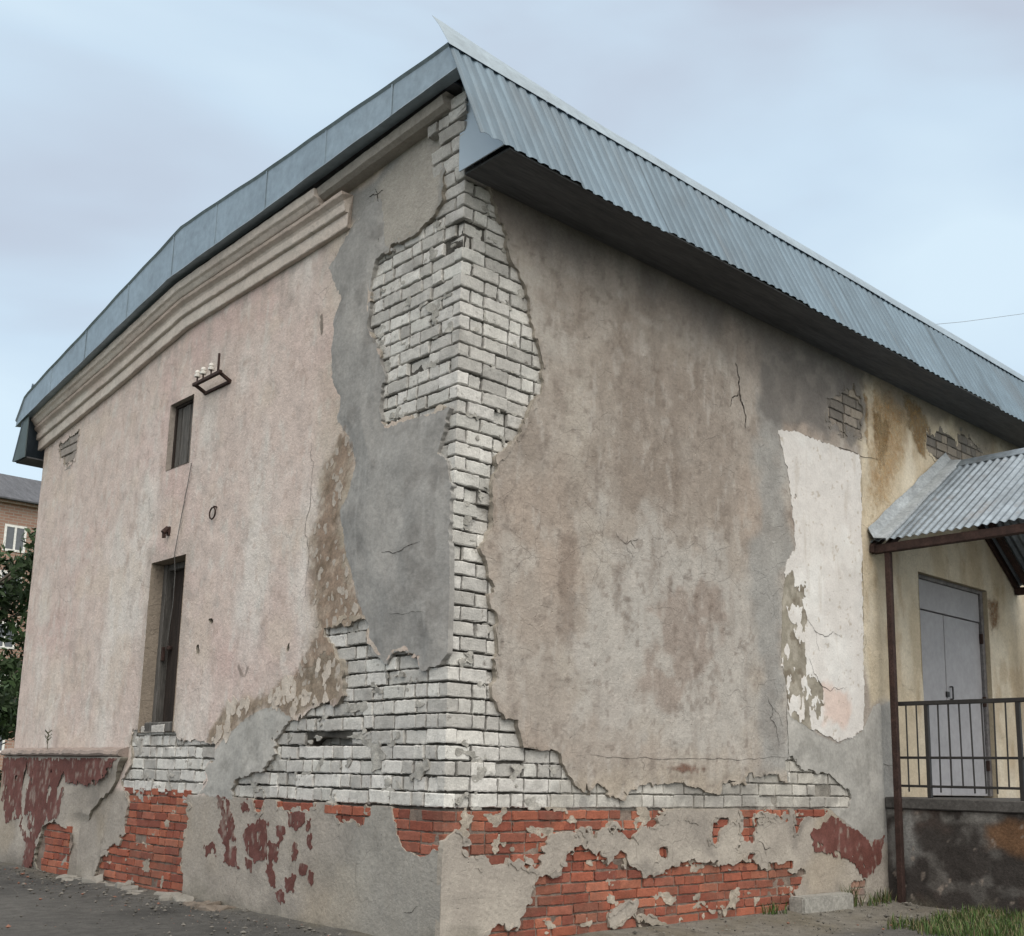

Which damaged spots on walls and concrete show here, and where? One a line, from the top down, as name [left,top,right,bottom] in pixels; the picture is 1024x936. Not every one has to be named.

peeling [58,429,80,471]
crack [730,364,746,427]
leakage [864,395,930,498]
peeling [922,426,986,462]
flaking render [97,91,885,936]
peeling [1,757,116,875]